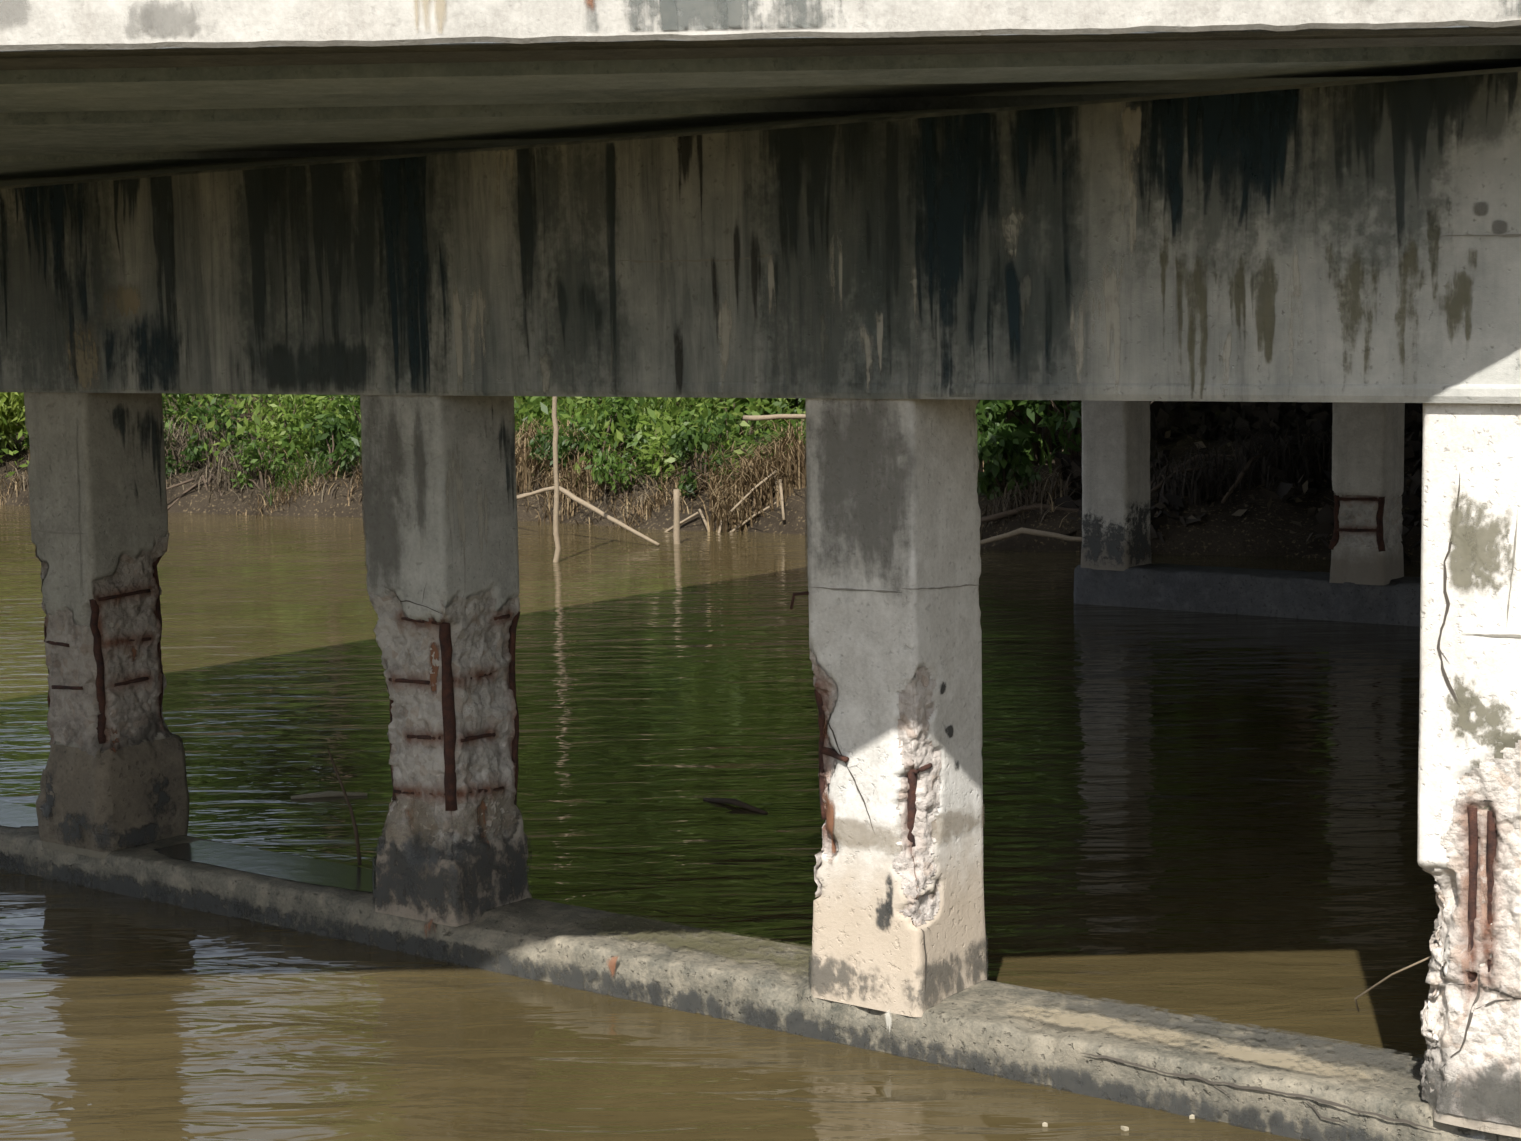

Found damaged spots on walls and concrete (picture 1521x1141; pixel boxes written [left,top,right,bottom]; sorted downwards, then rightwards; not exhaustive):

leakage [629,0,823,31]
leakage [805,89,1315,577]
leakage [1318,72,1517,371]
crack [1445,231,1521,239]
spalling [34,532,176,759]
corrosion [430,642,439,693]
spalling [369,588,521,862]
corrosion [823,794,836,860]
spalling [892,666,959,926]
spalling [1420,740,1521,1127]
corrosion [1465,857,1487,918]
crack [1437,476,1521,706]